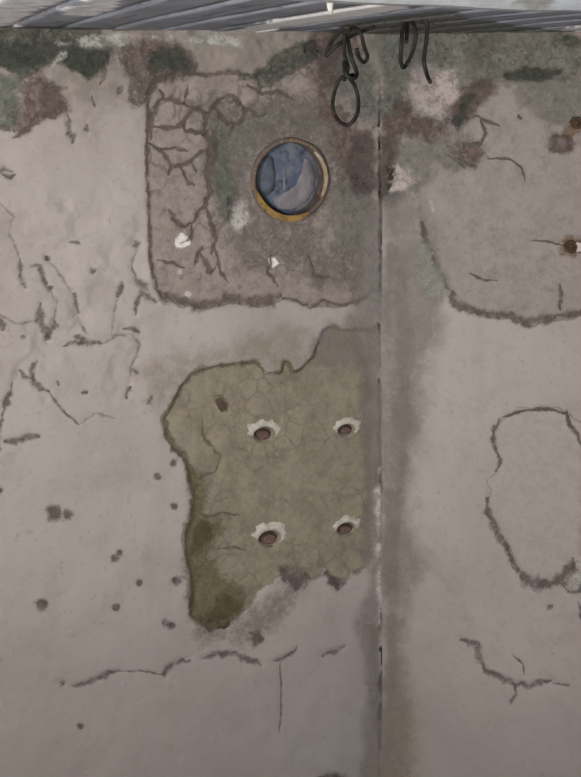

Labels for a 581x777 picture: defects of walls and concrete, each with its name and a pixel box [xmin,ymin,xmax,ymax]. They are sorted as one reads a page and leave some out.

crack [0,54,293,287]
flaking render [549,134,573,153]
crack [0,241,157,347]
crack [307,254,332,279]
crack [0,361,79,445]
leakage [194,12,581,777]
flaking render [47,506,71,521]
flaking render [160,325,381,630]
crack [61,647,297,731]
crack [459,639,569,702]